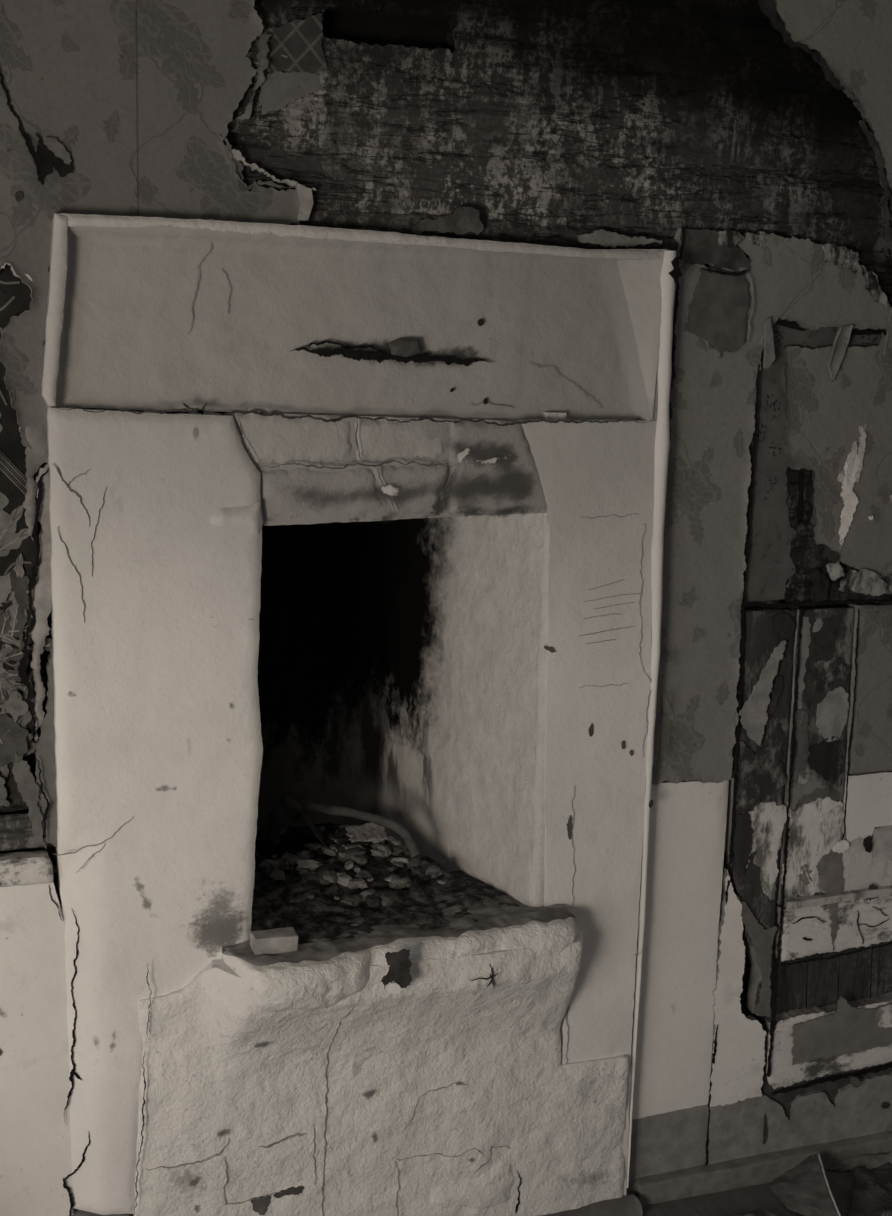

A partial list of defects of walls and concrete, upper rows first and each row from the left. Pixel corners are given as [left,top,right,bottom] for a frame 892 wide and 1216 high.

crack [0,71,44,185]
spalling [220,0,892,357]
crack [50,403,655,513]
crack [291,340,490,366]
spalling [12,424,57,848]
crack [18,464,134,873]
crack [49,888,90,1216]
spalling [380,949,412,994]